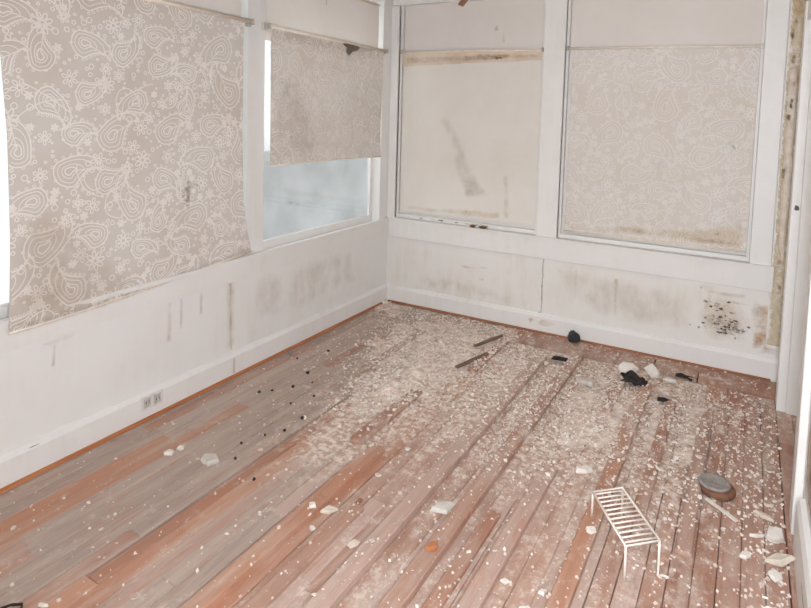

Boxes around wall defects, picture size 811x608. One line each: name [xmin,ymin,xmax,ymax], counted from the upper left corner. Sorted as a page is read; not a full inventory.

peeling [767,0,808,346]